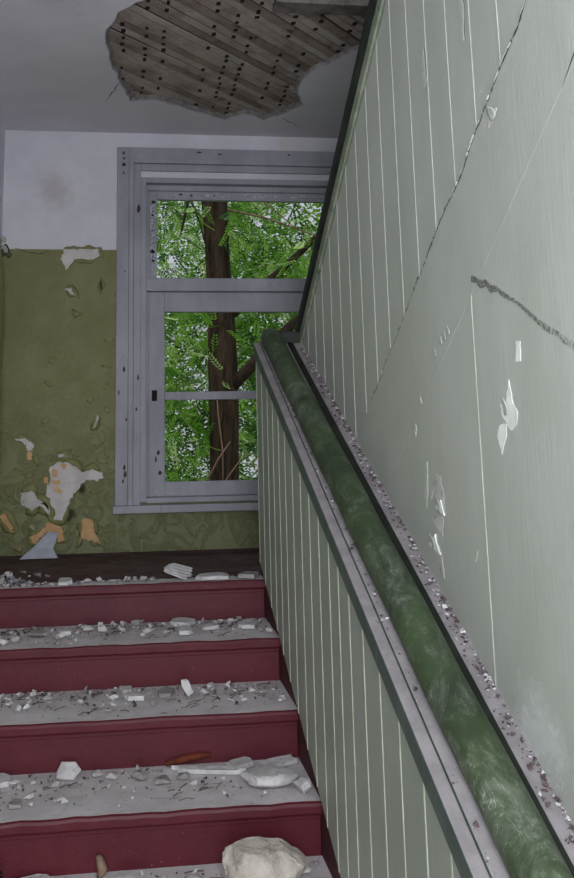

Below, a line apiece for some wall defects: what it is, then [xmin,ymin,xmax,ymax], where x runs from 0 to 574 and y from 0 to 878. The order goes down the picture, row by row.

flaking render [105,0,366,120]
crack [372,0,526,399]
peeling [60,245,104,270]
peeling [14,434,34,460]
peeling [497,380,518,454]
peeling [21,449,105,548]
peeling [425,462,445,579]